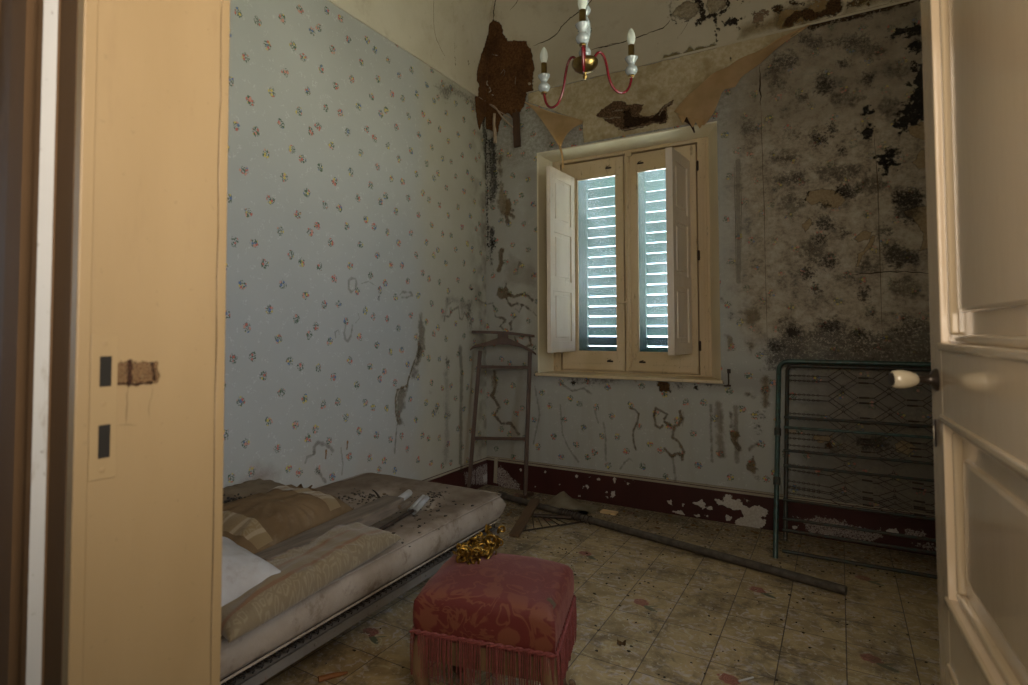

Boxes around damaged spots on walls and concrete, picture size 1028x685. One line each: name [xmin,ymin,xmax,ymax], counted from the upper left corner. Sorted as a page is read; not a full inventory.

crack [592,21,687,50]
flaking render [475,24,810,168]
leakage [873,22,924,176]
leakage [855,105,875,140]
leakage [893,188,924,225]
leakage [746,316,931,407]
leakage [731,432,756,473]
peeling [464,464,522,490]
peeling [667,494,768,528]